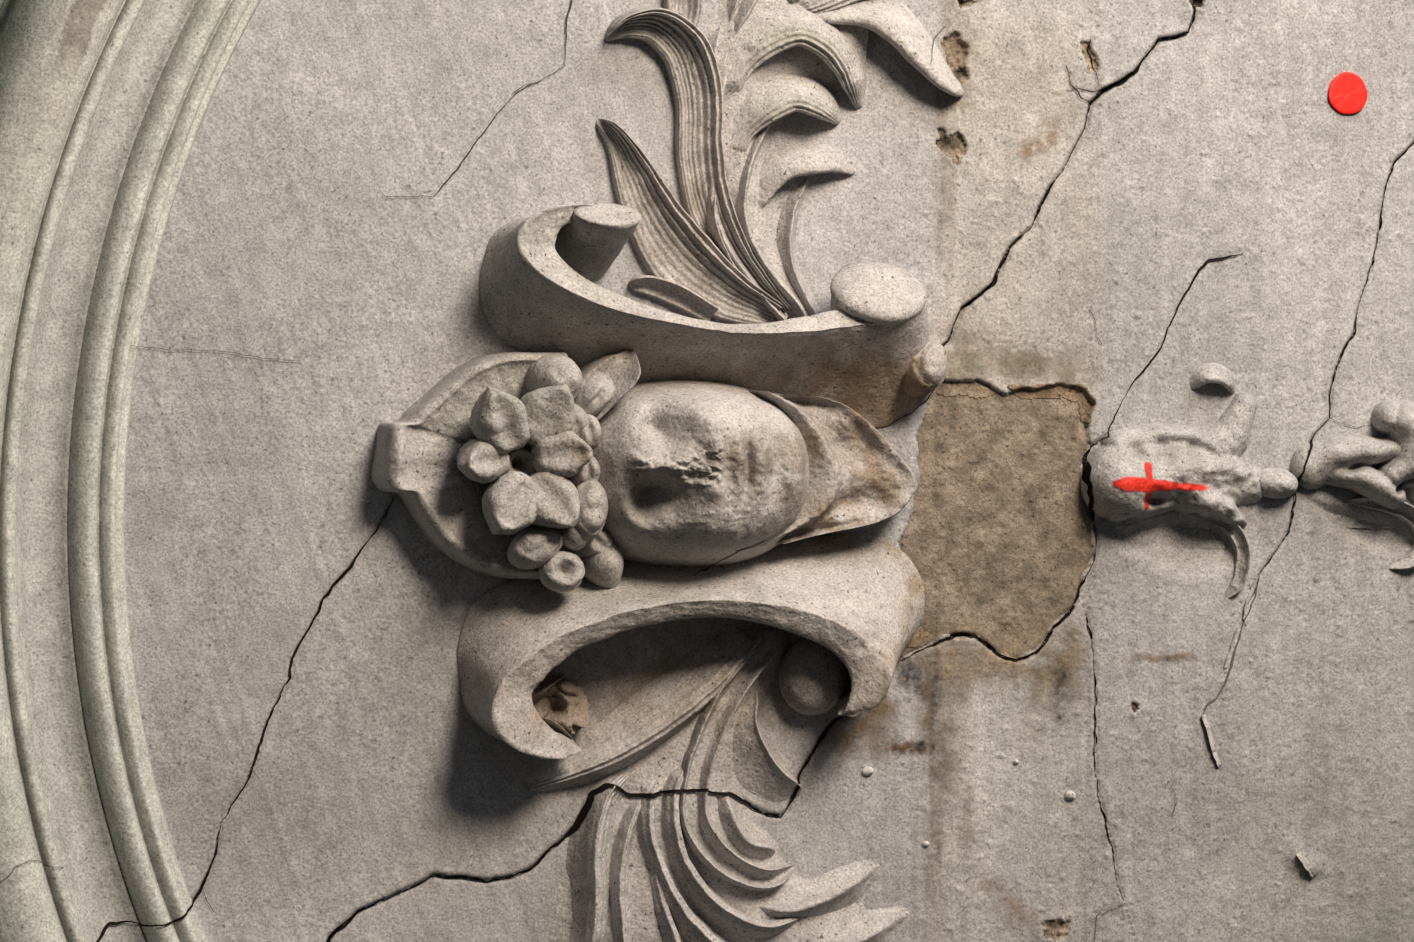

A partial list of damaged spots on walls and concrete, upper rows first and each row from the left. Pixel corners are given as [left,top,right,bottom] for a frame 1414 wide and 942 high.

crack [382,0,573,197]
flaking render [936,128,967,166]
flaking render [941,32,969,84]
crack [943,0,1196,353]
flaking render [1080,41,1098,74]
crack [693,518,798,576]
crack [877,392,933,429]
flaking render [899,381,1096,659]
crack [897,252,1244,941]
crack [1248,142,1414,604]
crack [96,497,395,942]
crack [327,715,845,942]